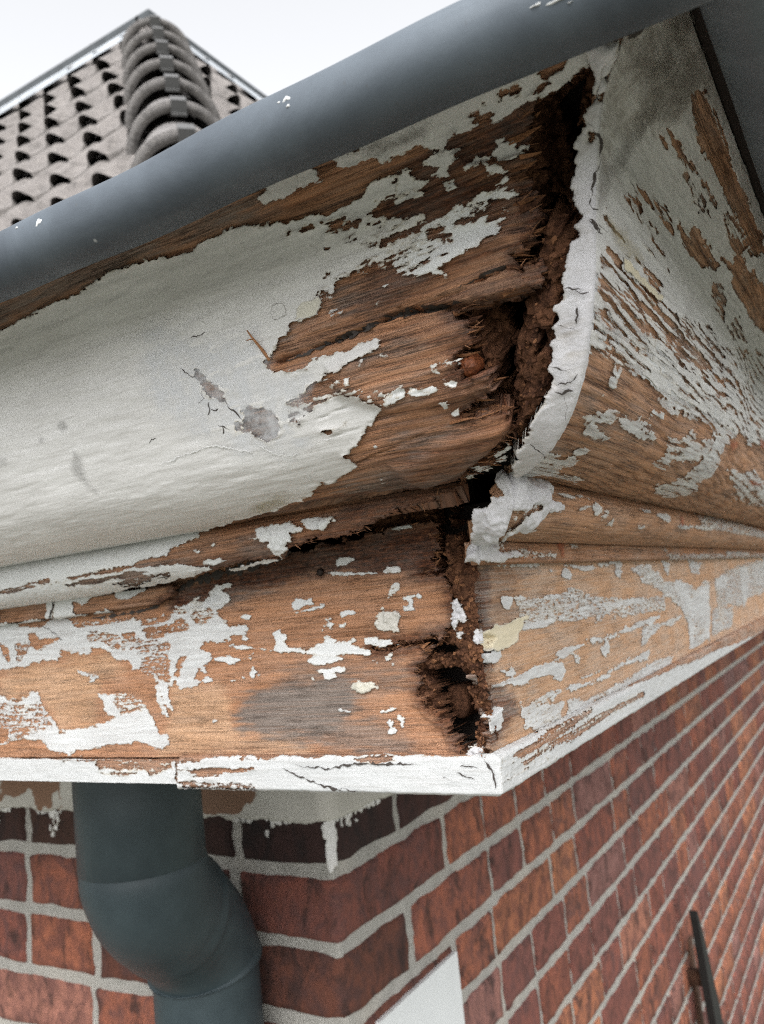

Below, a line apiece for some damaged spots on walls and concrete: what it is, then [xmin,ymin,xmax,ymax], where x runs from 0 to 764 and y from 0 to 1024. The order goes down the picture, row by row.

crack [589,68,612,234]
crack [558,287,588,331]
peeling [0,11,764,796]
crack [550,366,577,419]
crack [282,762,419,793]
crack [443,762,496,788]